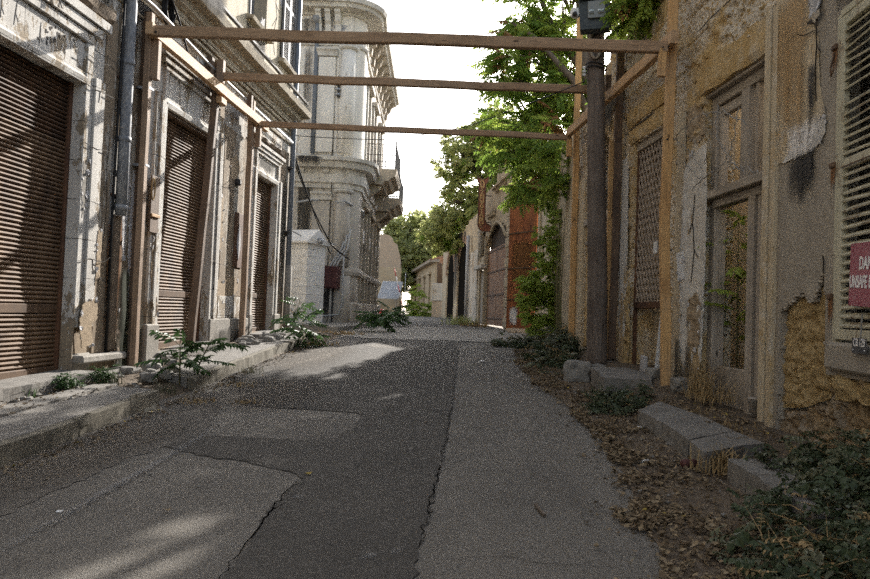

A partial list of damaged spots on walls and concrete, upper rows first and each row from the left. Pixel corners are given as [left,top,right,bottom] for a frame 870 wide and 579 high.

peeling [776,0,827,164]
peeling [676,143,707,387]
spalling [779,276,870,470]
crack [219,478,302,578]